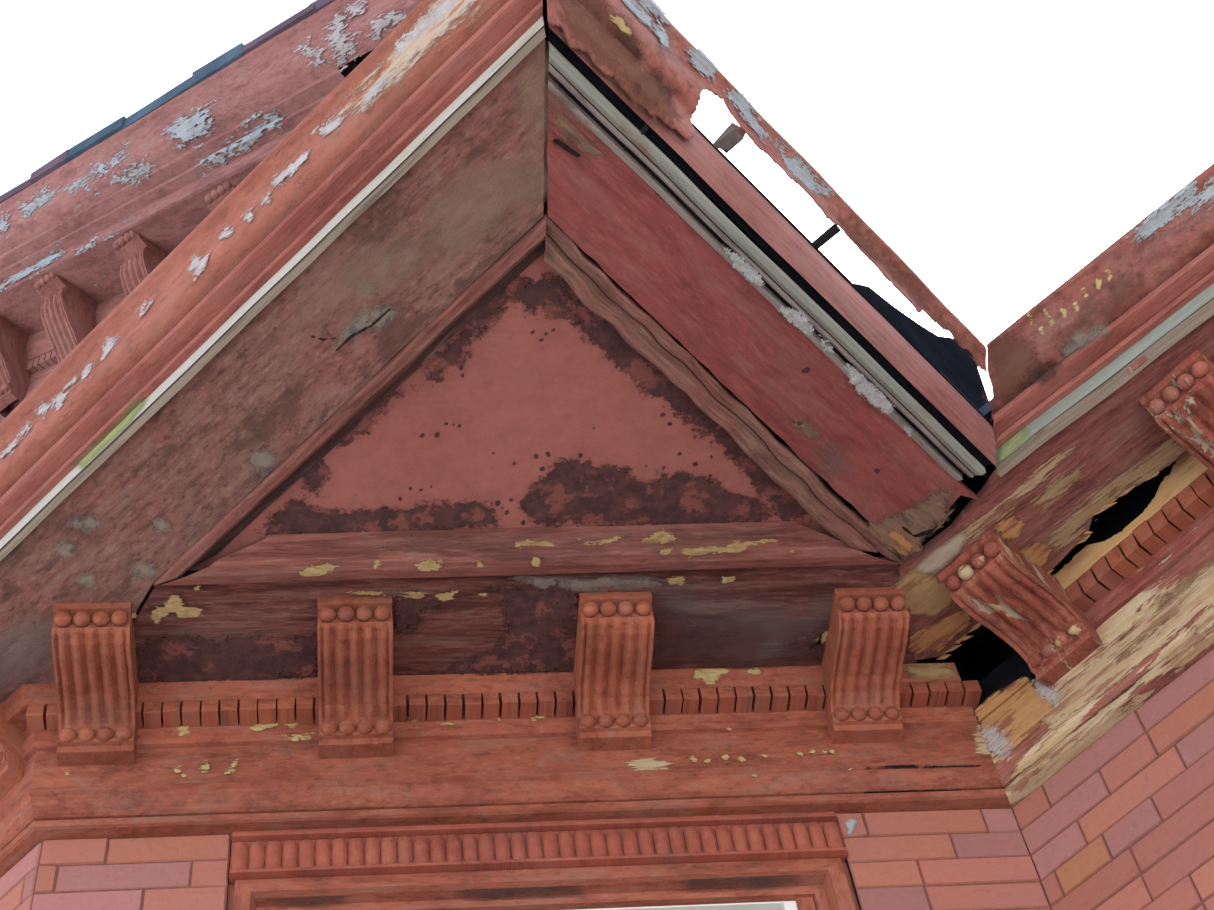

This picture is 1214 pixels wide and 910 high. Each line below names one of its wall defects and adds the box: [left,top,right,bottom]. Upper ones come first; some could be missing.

peeling [0,141,157,238]
peeling [161,98,288,176]
peeling [186,149,310,281]
peeling [292,0,485,137]
peeling [623,0,835,199]
peeling [1125,175,1214,243]
peeling [0,335,122,460]
peeling [915,432,1187,574]
water stain [391,590,440,634]
water stain [445,579,579,676]
water stain [654,601,829,667]
peeling [1006,557,1214,793]